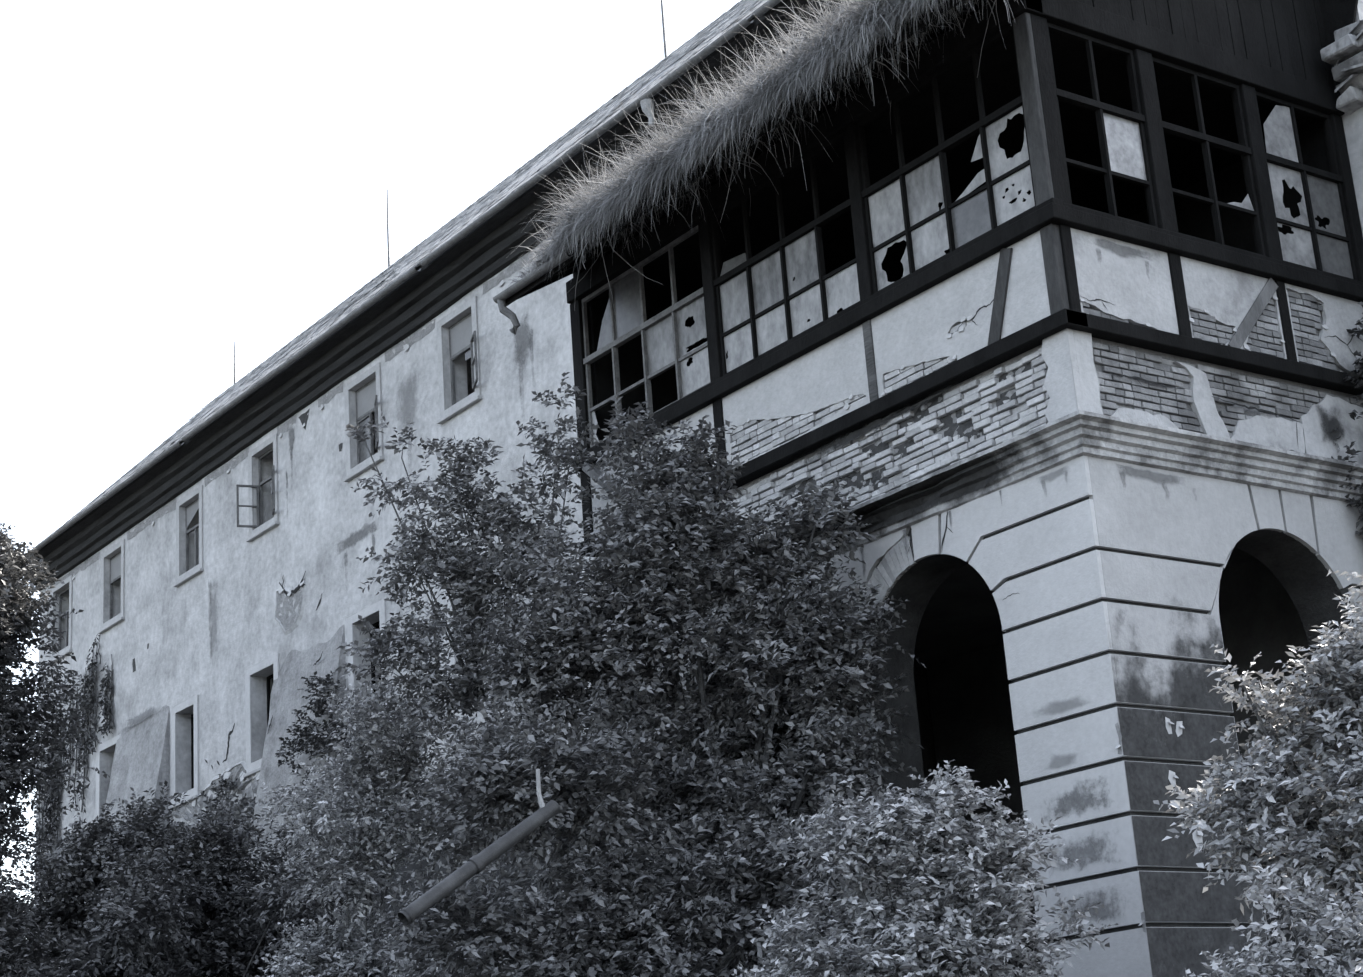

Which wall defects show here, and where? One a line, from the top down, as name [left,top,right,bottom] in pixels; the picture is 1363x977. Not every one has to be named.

crack [957,299,994,330]
peeling [1188,290,1344,372]
spalling [996,362,1031,407]
peeling [730,354,957,465]
spalling [783,393,987,499]
damp [1055,786,1105,816]
damp [1061,839,1104,868]
damp [1071,892,1114,920]